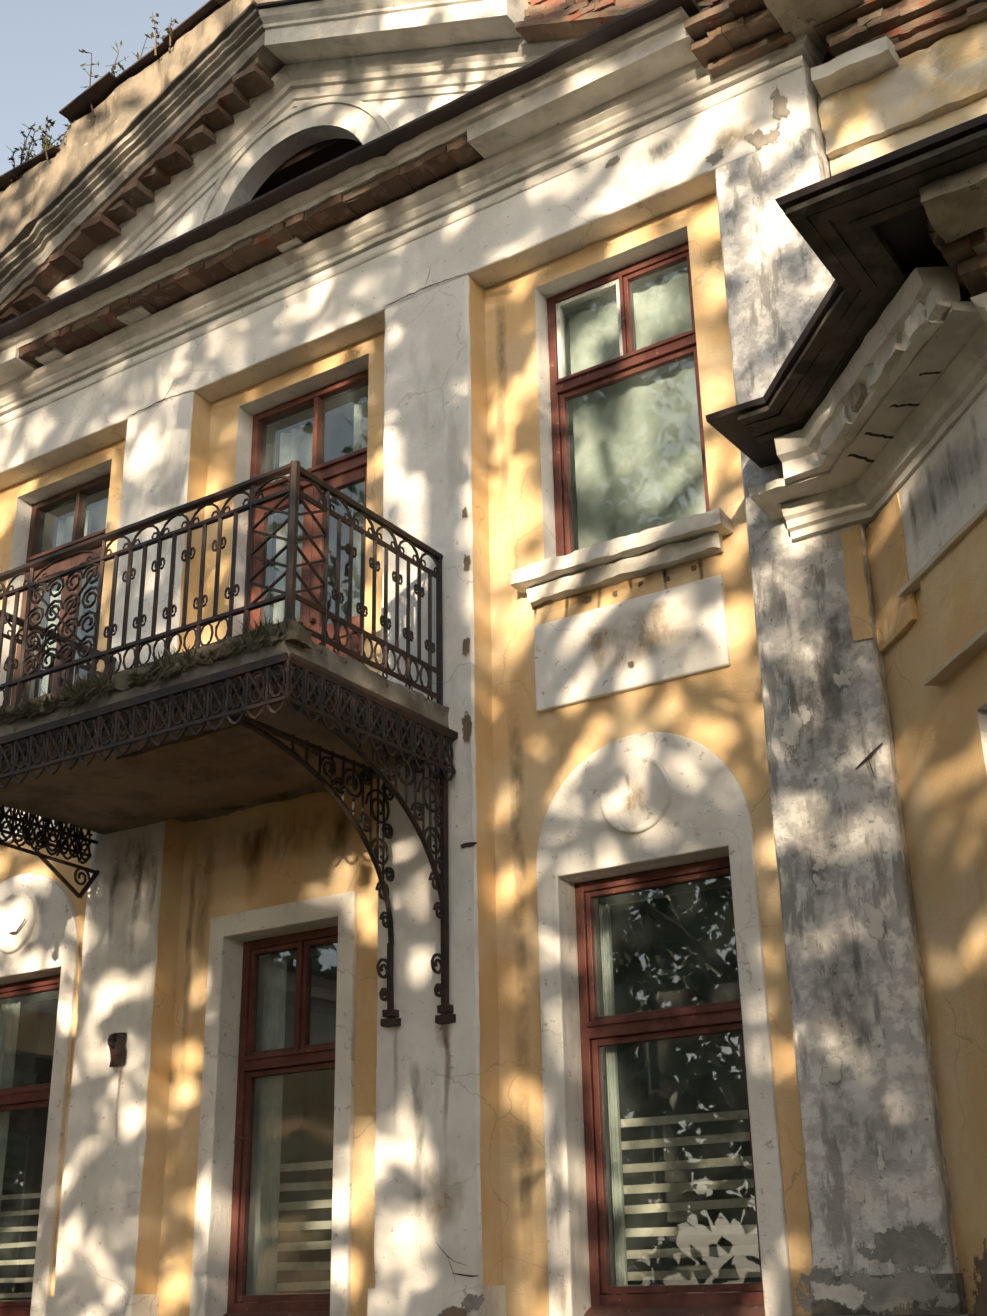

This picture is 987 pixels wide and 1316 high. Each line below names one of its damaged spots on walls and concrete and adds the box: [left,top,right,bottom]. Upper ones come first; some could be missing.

peeling [706,87,790,165]
leakage [628,621,659,667]
peeling [779,617,863,766]
peeling [810,1281,872,1311]
peeling [856,1222,947,1272]
spalling [973,1238,987,1316]